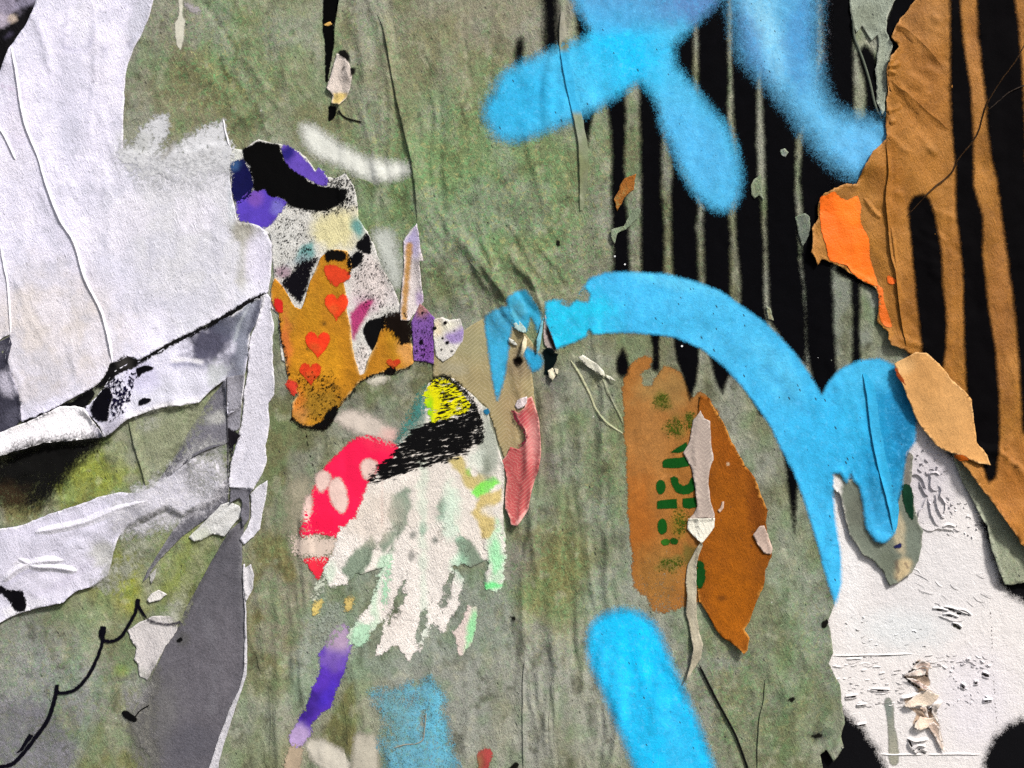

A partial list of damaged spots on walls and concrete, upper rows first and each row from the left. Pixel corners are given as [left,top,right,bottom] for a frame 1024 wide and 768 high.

peeling [845,660,945,754]